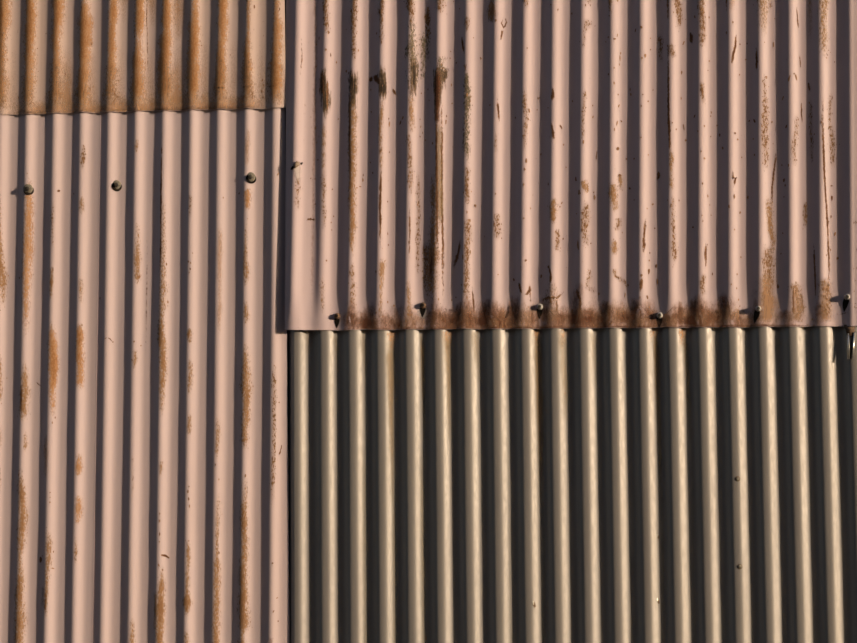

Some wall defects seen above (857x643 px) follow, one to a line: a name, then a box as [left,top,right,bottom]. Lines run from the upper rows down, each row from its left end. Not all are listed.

corrosion [403,0,474,77]
corrosion [487,0,507,38]
corrosion [641,0,710,261]
corrosion [0,195,34,318]
corrosion [157,148,169,410]
corrosion [17,326,58,424]
corrosion [76,324,85,384]
corrosion [240,348,252,445]
corrosion [14,474,28,643]
corrosion [154,554,169,643]
corrosion [212,501,221,643]
corrosion [237,474,253,643]